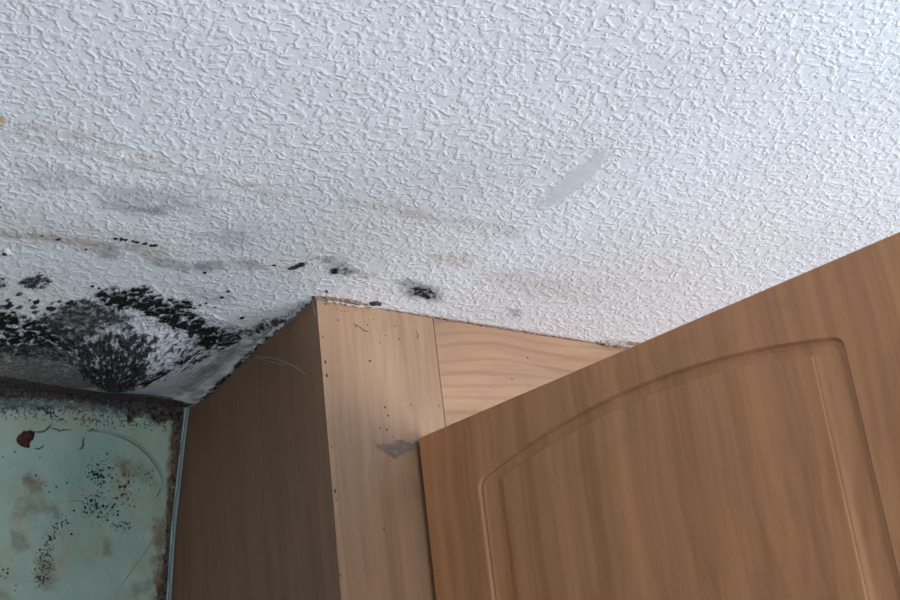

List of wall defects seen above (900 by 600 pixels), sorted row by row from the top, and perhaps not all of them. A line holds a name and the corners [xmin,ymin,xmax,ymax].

water stain [0,272,312,600]
water stain [409,285,436,299]